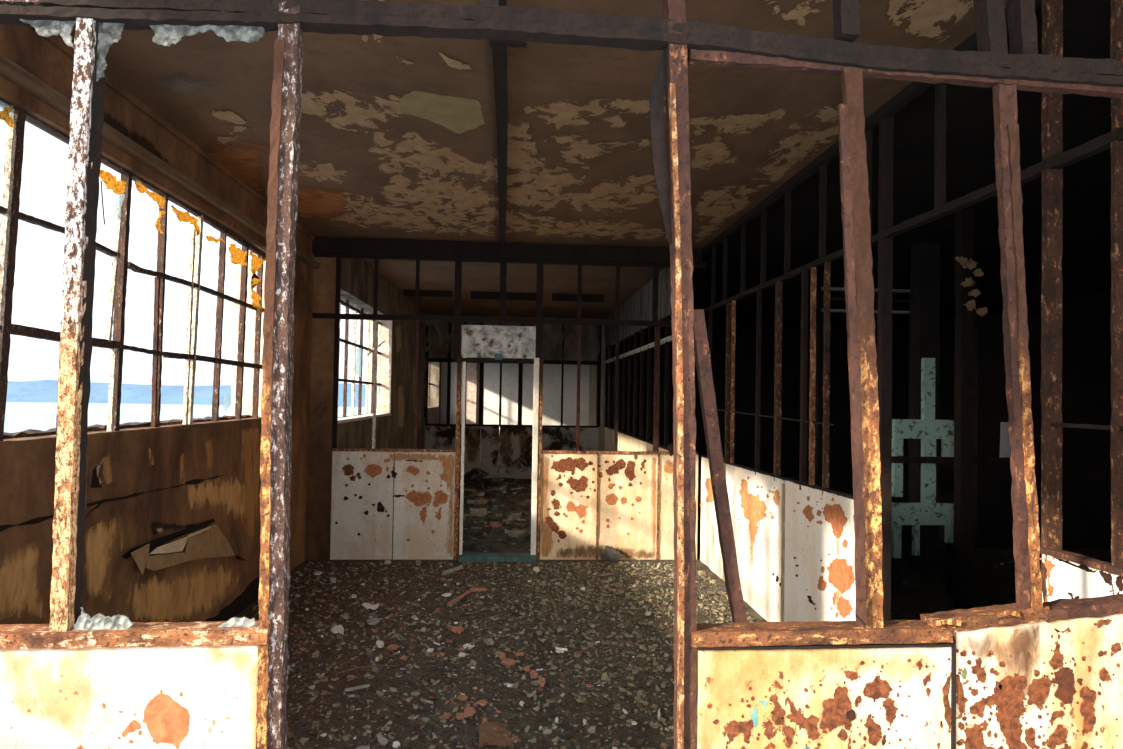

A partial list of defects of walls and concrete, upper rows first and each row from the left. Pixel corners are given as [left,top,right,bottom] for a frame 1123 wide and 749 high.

peeling [765,0,825,26]
peeling [887,0,974,43]
peeling [299,83,668,241]
crack [0,514,54,532]
crack [84,475,223,520]
corrosion [342,453,454,553]
corrosion [541,453,673,558]
corrosion [737,476,781,564]
corrosion [793,495,855,618]
corrosion [108,682,199,749]
corrosion [707,619,1123,749]